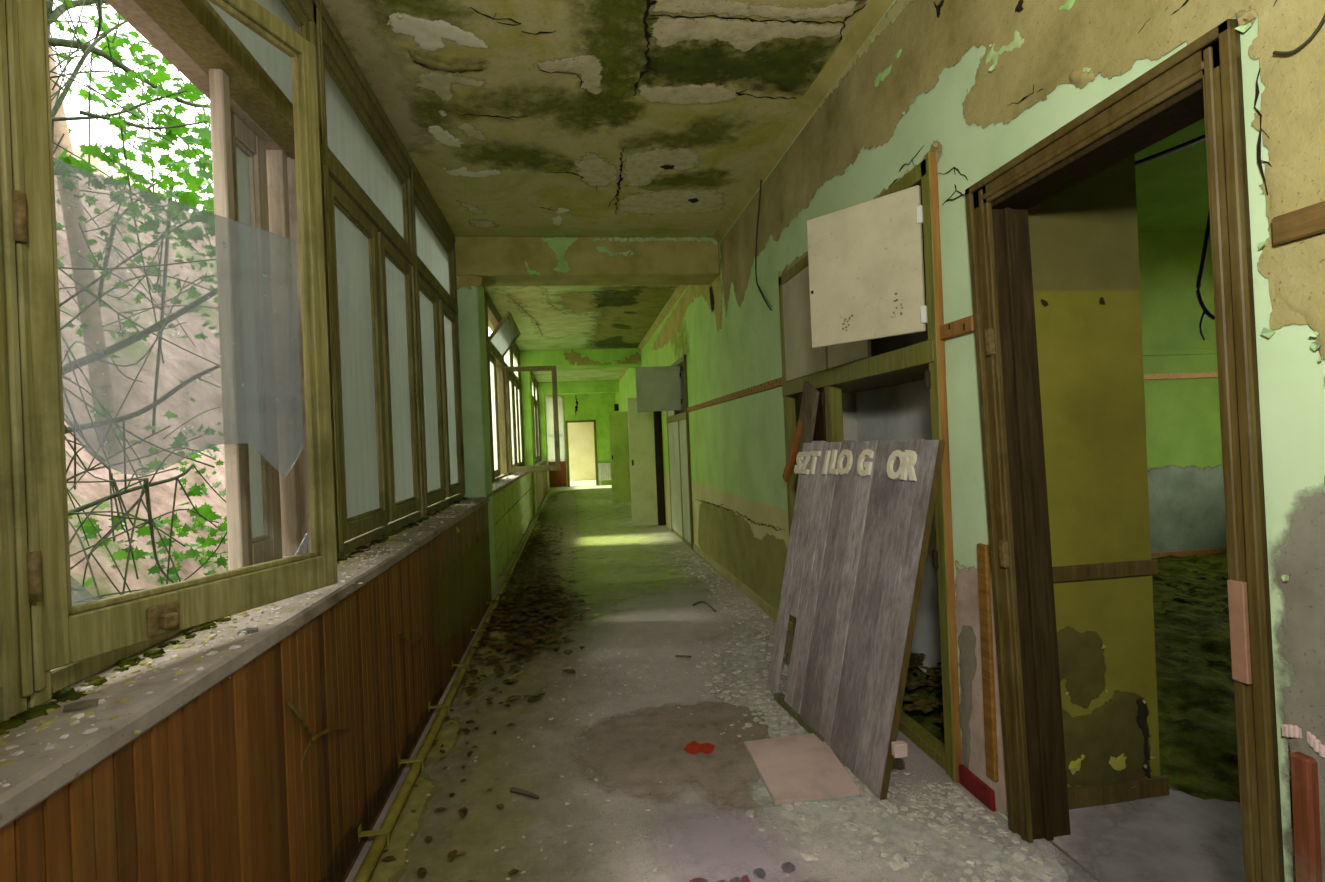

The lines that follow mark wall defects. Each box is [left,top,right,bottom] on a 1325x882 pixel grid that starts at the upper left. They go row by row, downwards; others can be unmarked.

peeling [387,12,489,52]
peeling [416,70,486,147]
water stain [461,143,574,171]
crack [470,7,596,96]
water stain [322,0,839,153]
crack [548,148,624,214]
crack [633,0,866,96]
peeling [457,0,1325,365]
peeling [698,501,792,622]
water stain [319,489,708,882]
water stain [572,625,1244,882]
peeling [1057,626,1156,788]